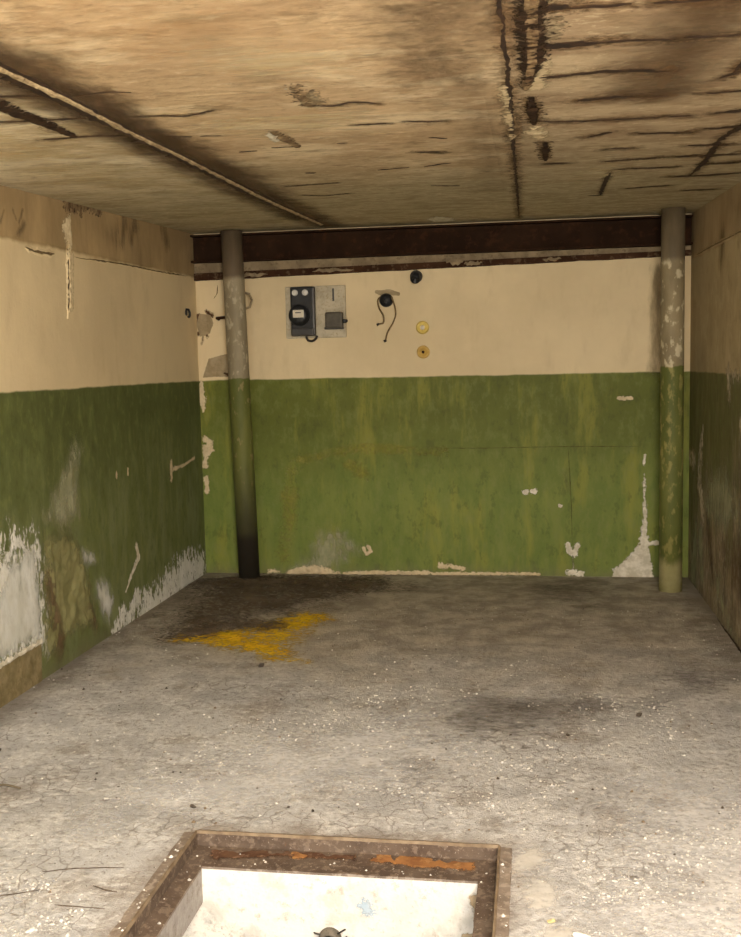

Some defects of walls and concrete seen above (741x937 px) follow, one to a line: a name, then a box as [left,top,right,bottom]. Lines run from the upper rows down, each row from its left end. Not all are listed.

crack [0,54,349,227]
crack [494,0,741,218]
peeling [169,435,215,494]
peeling [612,454,659,577]
peeling [125,542,140,592]
peeling [0,638,43,708]
corrosion [210,850,356,861]
corrosion [370,854,475,871]